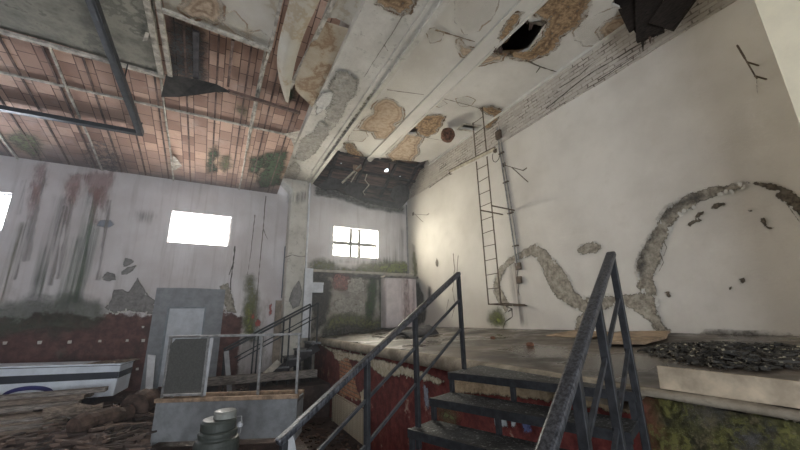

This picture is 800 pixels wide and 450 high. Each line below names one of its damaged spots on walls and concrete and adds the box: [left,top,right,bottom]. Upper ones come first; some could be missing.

peeling [284,71,359,180]
damp [0,180,102,336]
peeling [102,258,155,315]
peeling [289,281,302,309]
damp [311,272,385,336]
peeling [493,242,590,330]
peeling [577,241,601,255]
peeling [602,181,800,331]
peeling [321,345,555,408]